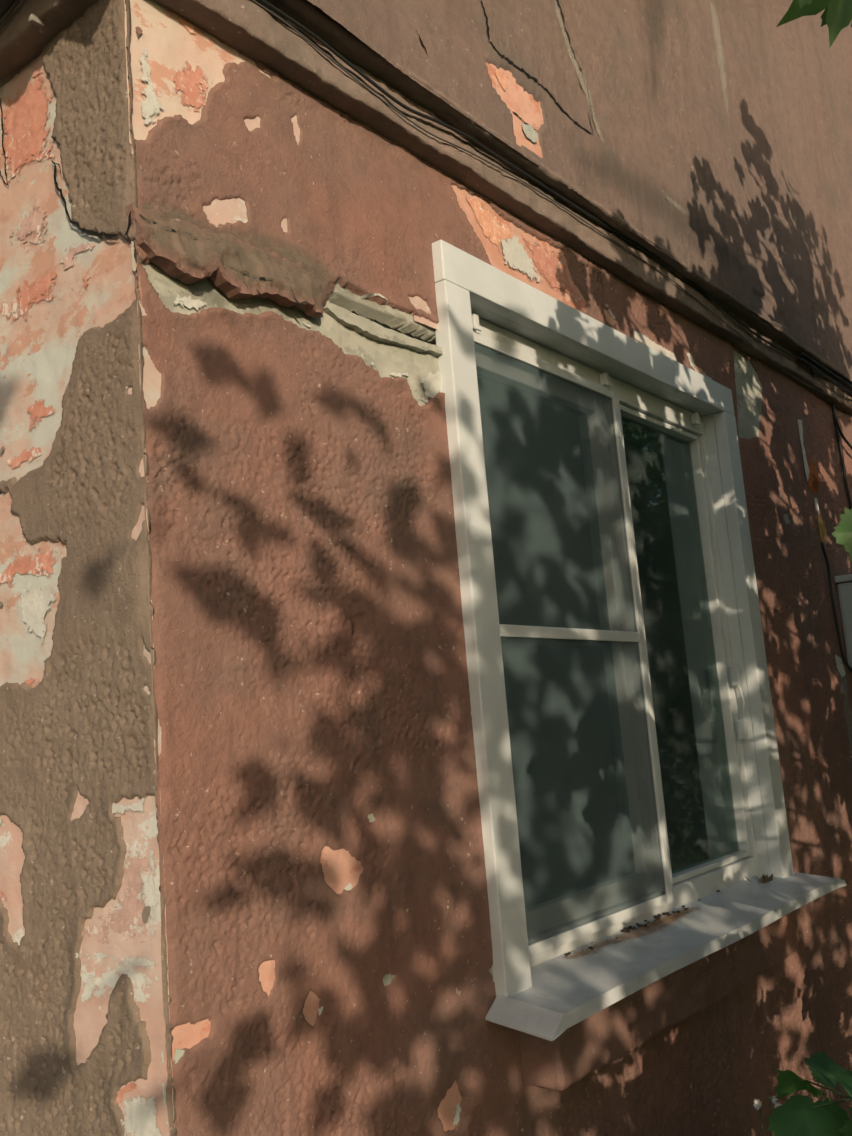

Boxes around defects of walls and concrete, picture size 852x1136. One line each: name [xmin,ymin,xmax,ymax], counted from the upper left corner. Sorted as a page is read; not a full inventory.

flaking render [124,0,270,154]
flaking render [486,63,544,158]
crack [481,0,599,136]
crack [51,160,131,240]
flaking render [452,185,587,312]
flaking render [0,53,443,688]
flaking render [71,791,90,821]
flaking render [0,815,26,945]
flaking render [73,795,210,1136]
flaking render [320,846,364,894]
rust [588,899,700,950]
flaking render [438,1080,461,1131]